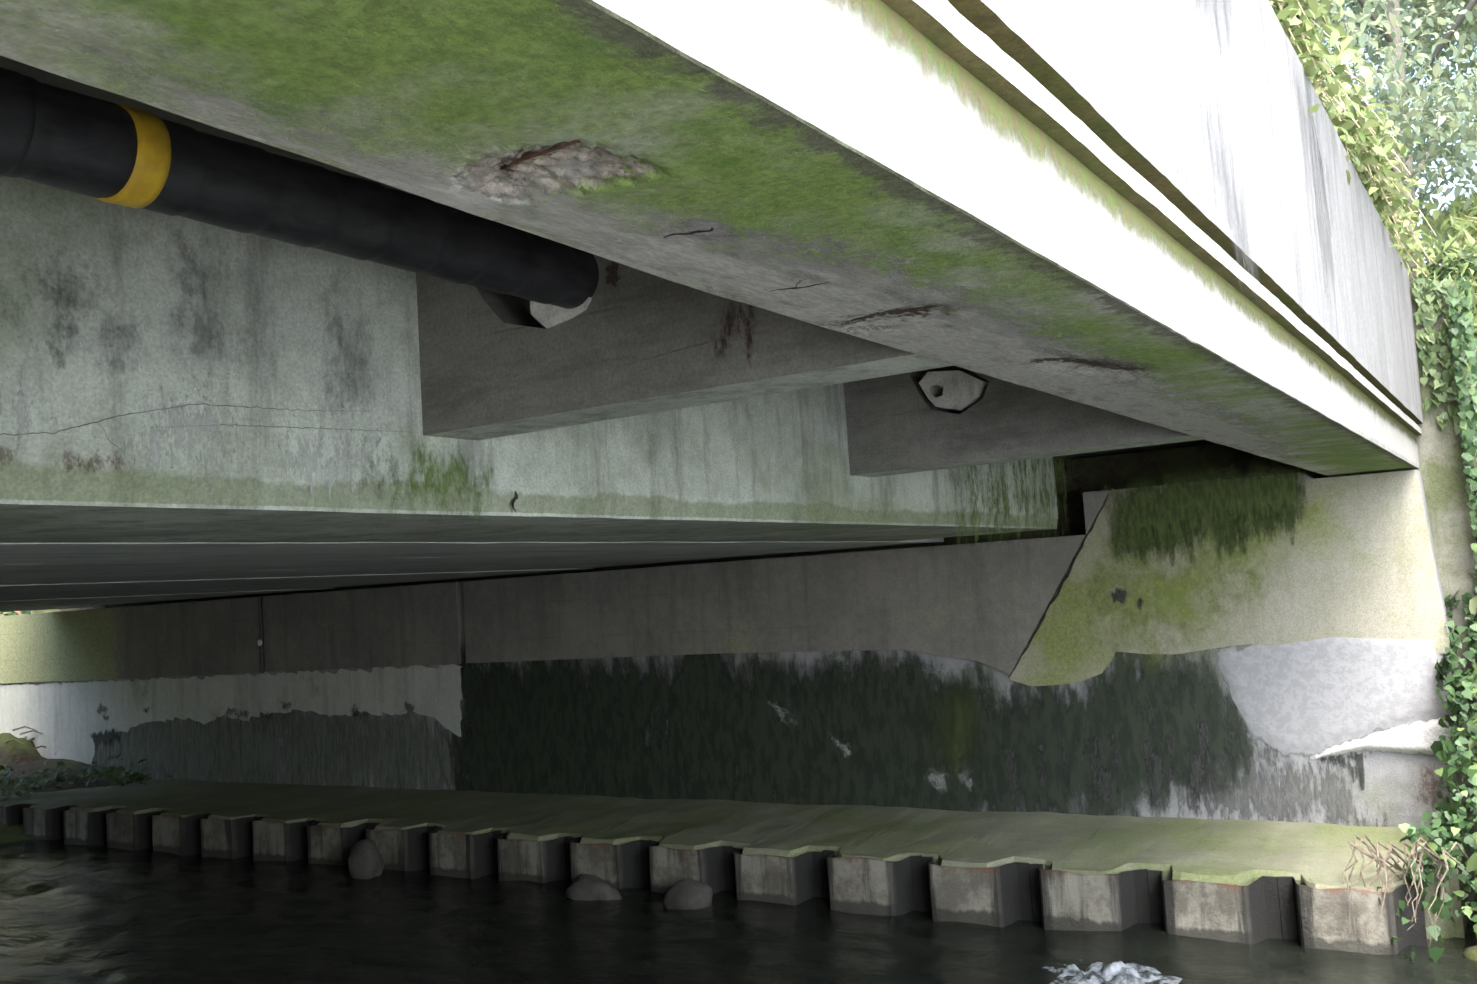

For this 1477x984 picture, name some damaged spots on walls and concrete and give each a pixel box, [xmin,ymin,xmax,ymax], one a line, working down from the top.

spalling [453,140,658,200]
rust [715,302,753,358]
water stain [1126,505,1294,564]
water stain [90,649,1387,827]